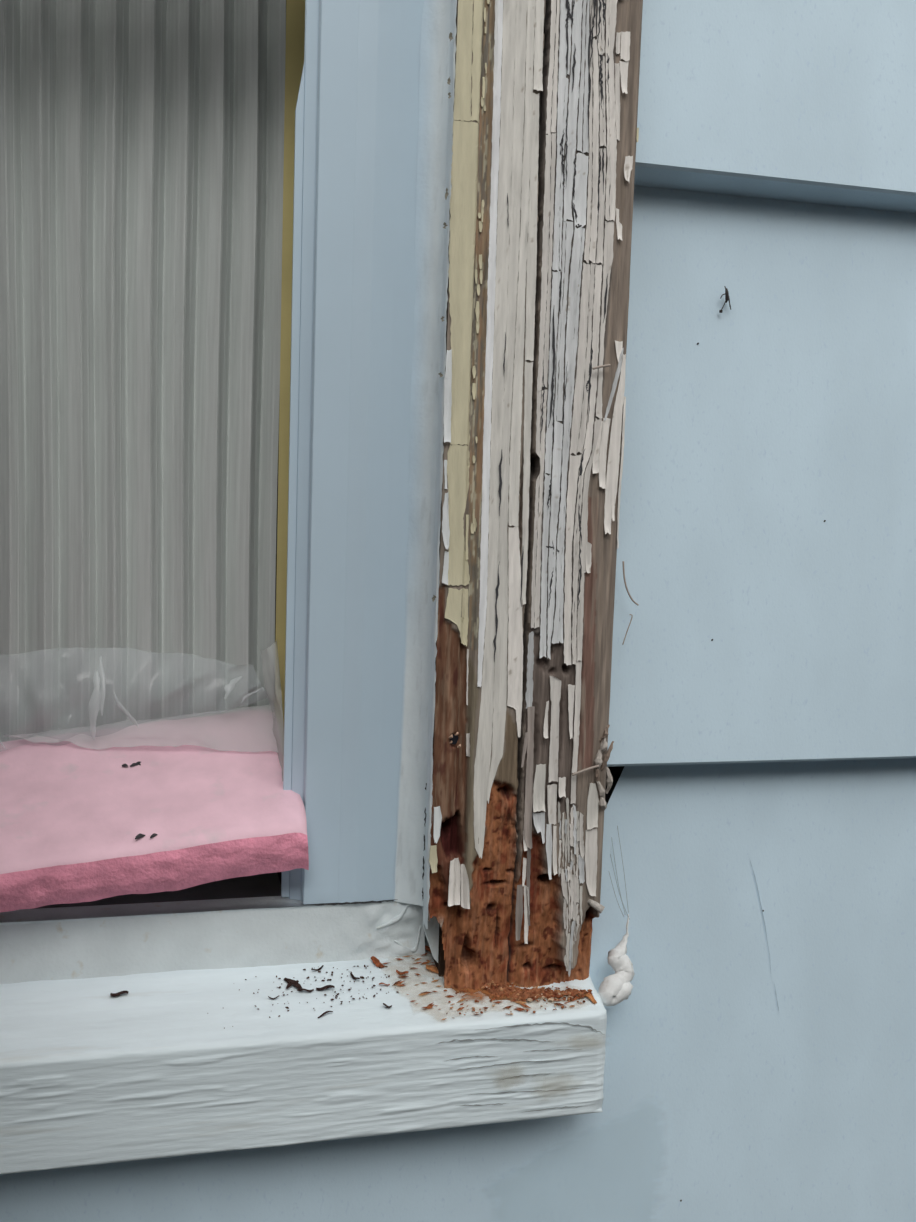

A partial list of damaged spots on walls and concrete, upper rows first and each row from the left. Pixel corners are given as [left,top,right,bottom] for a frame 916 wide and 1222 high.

peeling [429,0,633,976]